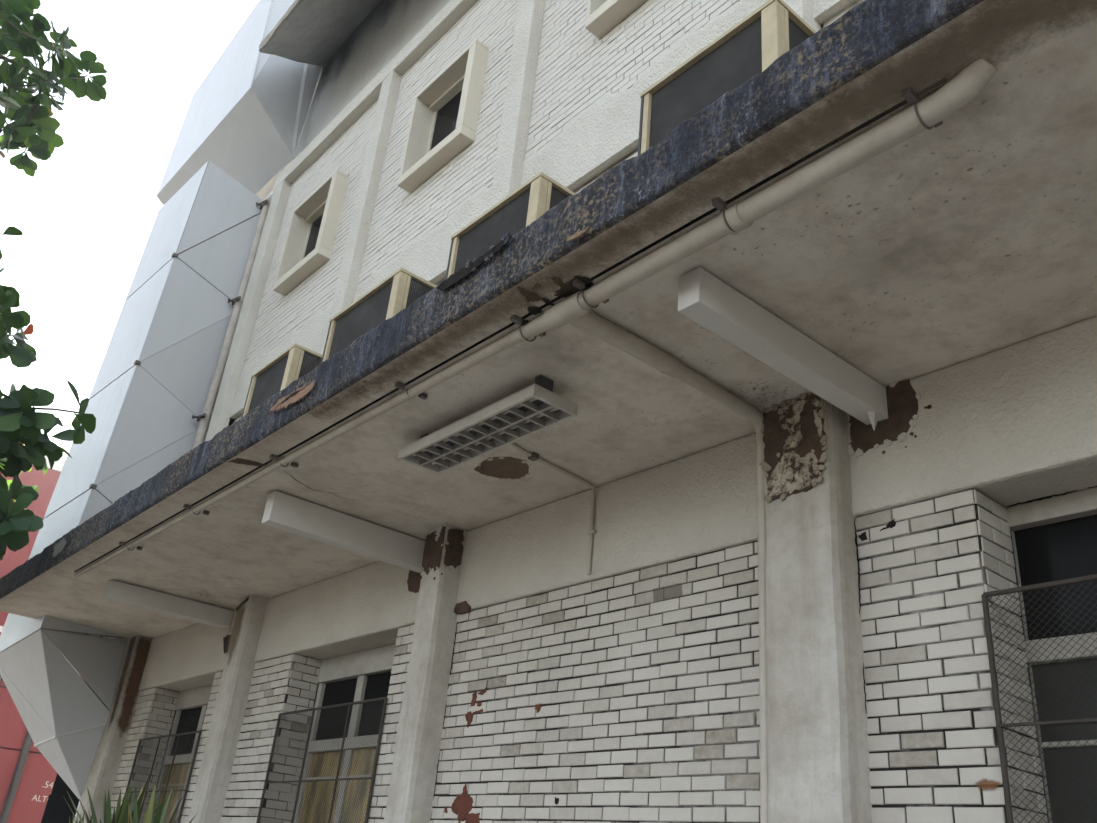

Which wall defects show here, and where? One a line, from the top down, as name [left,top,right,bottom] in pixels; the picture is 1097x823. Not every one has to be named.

water stain [318,0,1097,414]
spalling [474,456,530,481]
peeling [759,392,828,503]
spalling [847,379,932,458]
spalling [407,523,467,593]
spalling [454,601,471,614]
peeling [465,688,486,727]
peeling [444,783,480,823]